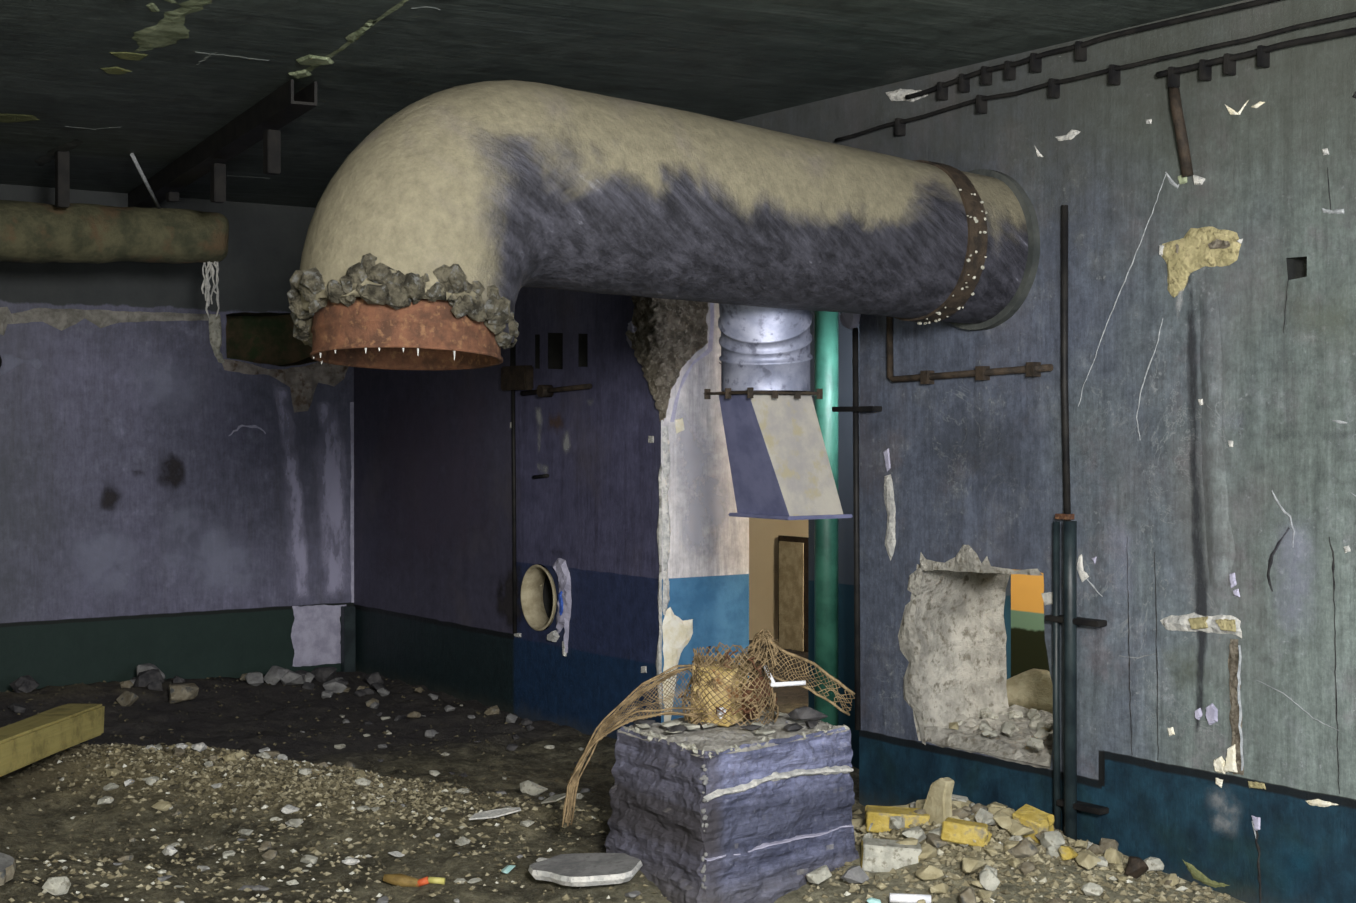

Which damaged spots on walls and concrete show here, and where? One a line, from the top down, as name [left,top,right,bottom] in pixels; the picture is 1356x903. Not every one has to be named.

peeling [100,0,212,75]
spalling [1159,226,1243,306]
spalling [0,307,349,413]
spalling [619,296,854,832]
spalling [898,545,1042,745]
peeling [1041,592,1053,605]
peeling [1229,573,1240,597]
spalling [1160,613,1266,790]